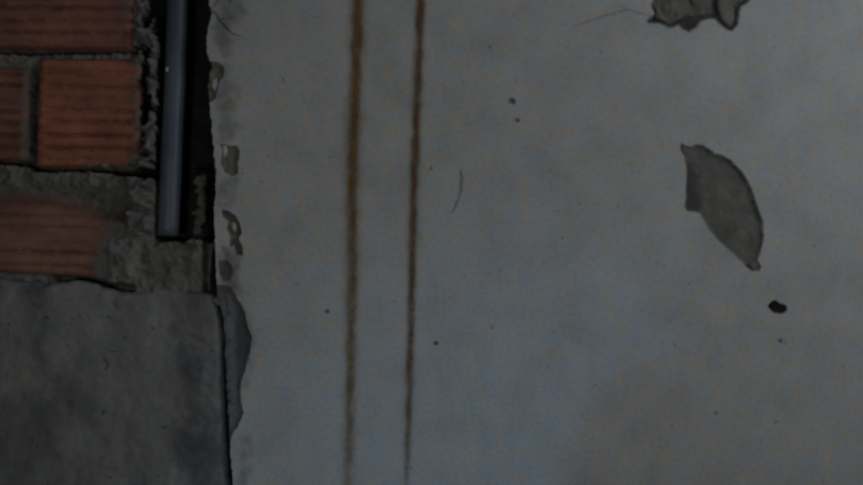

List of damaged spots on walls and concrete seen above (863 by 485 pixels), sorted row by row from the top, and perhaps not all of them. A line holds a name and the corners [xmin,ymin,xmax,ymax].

flaking render [0,0,252,443]
corrosion [349,0,362,294]
corrosion [410,0,423,310]
spalling [647,0,749,32]
peeling [680,143,764,271]